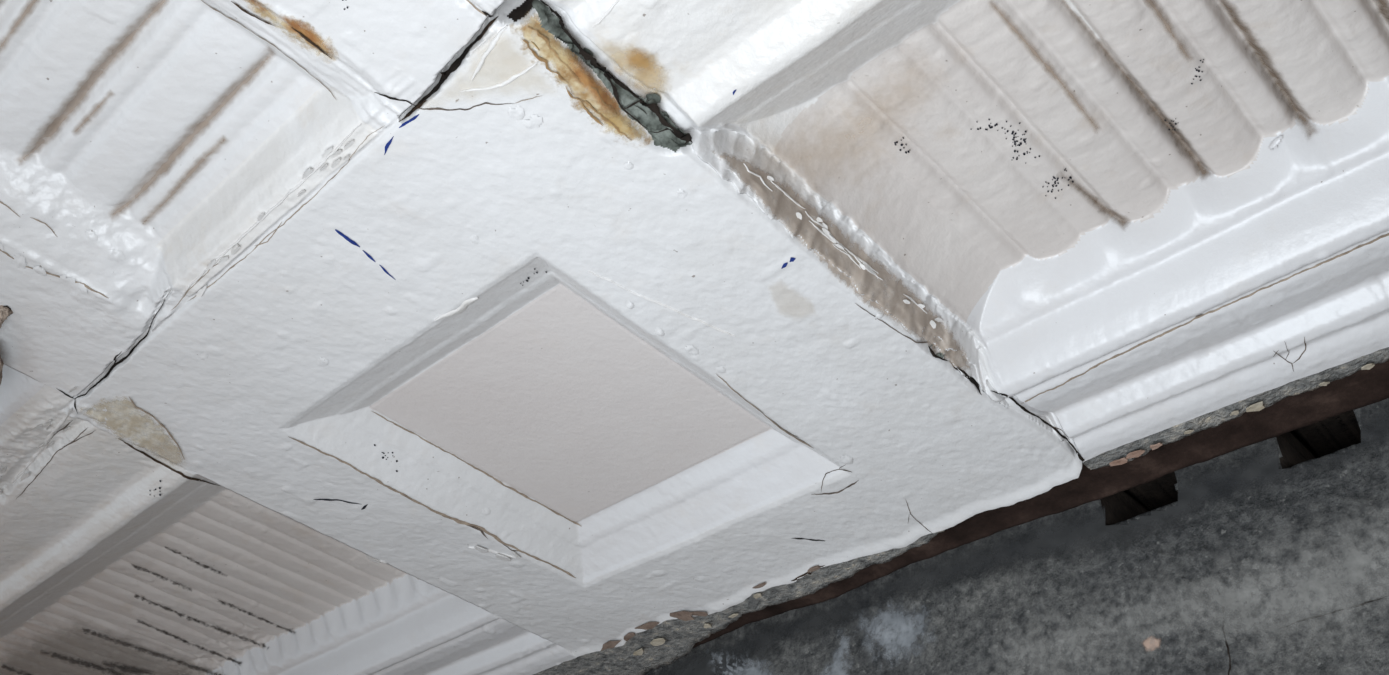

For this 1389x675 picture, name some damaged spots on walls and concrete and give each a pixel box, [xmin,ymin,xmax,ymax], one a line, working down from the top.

rust [231,0,332,59]
rust [521,17,650,144]
rust [614,53,659,88]
crack [0,249,107,298]
crack [59,0,540,411]
peeling [720,155,969,368]
crack [855,233,1389,462]
spalling [0,388,185,499]